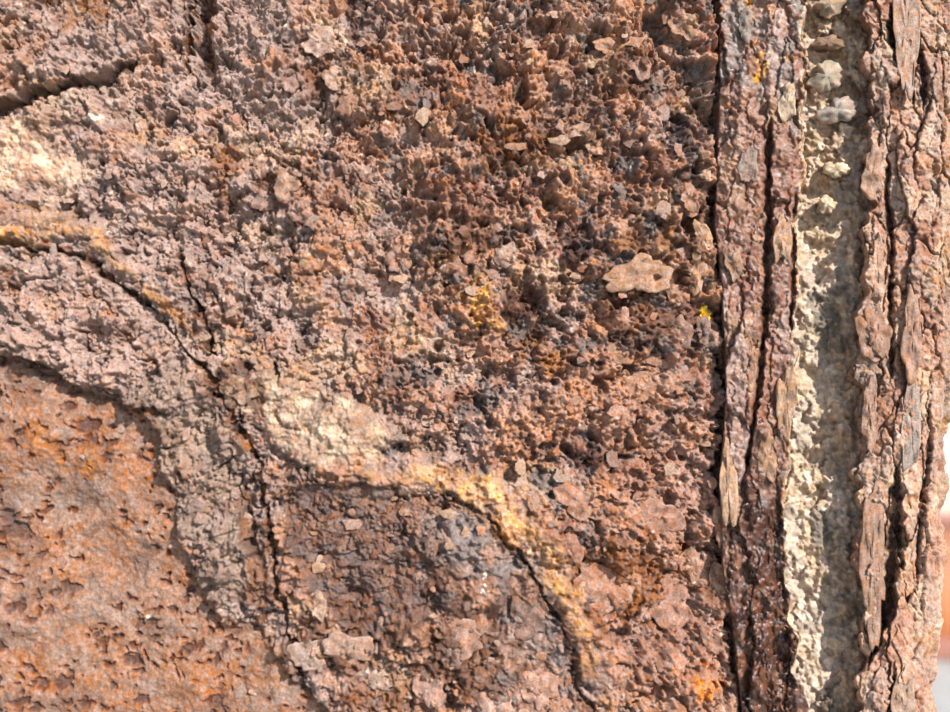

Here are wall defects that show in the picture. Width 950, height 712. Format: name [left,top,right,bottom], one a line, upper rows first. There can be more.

crack [0,57,140,116]
rust [0,205,116,269]
crack [0,237,282,624]
rust [143,289,230,371]
rust [469,272,506,333]
rust [413,467,595,655]
crack [469,505,596,712]
rust [691,660,725,703]
crack [708,354,741,712]
crack [743,117,797,485]
crack [885,147,907,387]
rust [847,0,950,712]